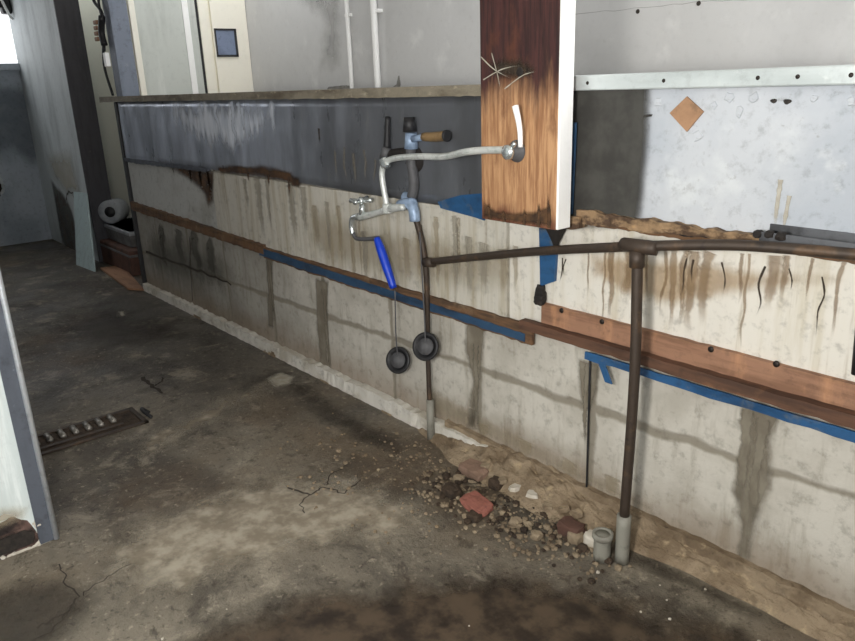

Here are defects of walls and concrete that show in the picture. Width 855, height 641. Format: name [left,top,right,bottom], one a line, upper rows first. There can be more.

rust [172,166,300,204]
damp [737,409,770,511]
flaking render [0,521,50,560]